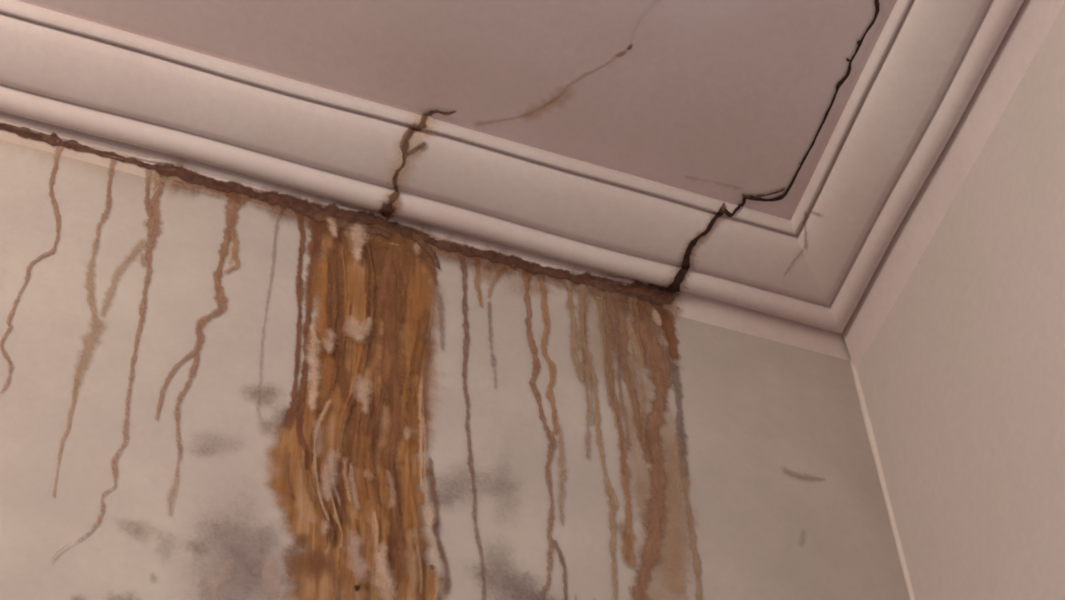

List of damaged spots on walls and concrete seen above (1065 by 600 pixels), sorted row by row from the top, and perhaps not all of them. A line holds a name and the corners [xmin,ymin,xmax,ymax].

crack [0,0,880,313]